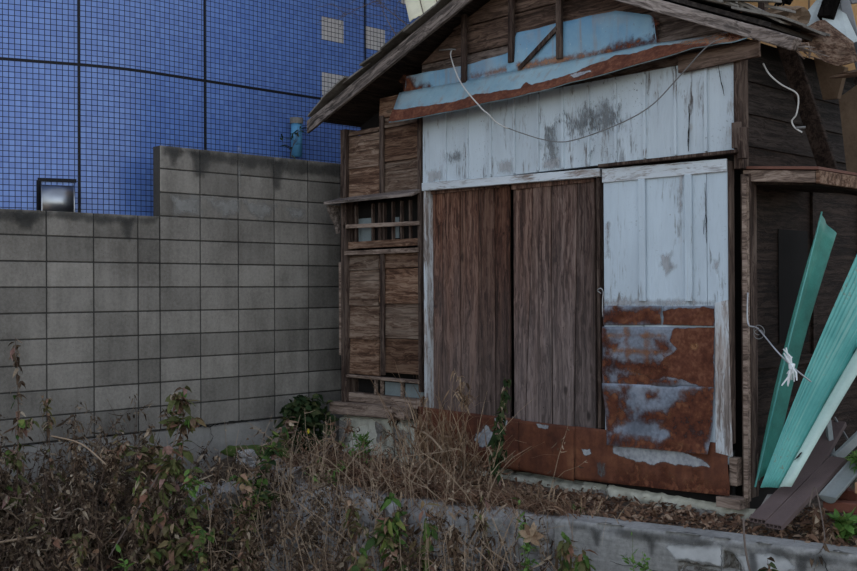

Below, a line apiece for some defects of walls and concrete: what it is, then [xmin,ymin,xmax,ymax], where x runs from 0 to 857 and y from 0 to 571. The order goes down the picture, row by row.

corrosion [388,18,746,122]
water stain [194,152,341,187]
water stain [540,98,621,161]
corrosion [602,305,715,454]